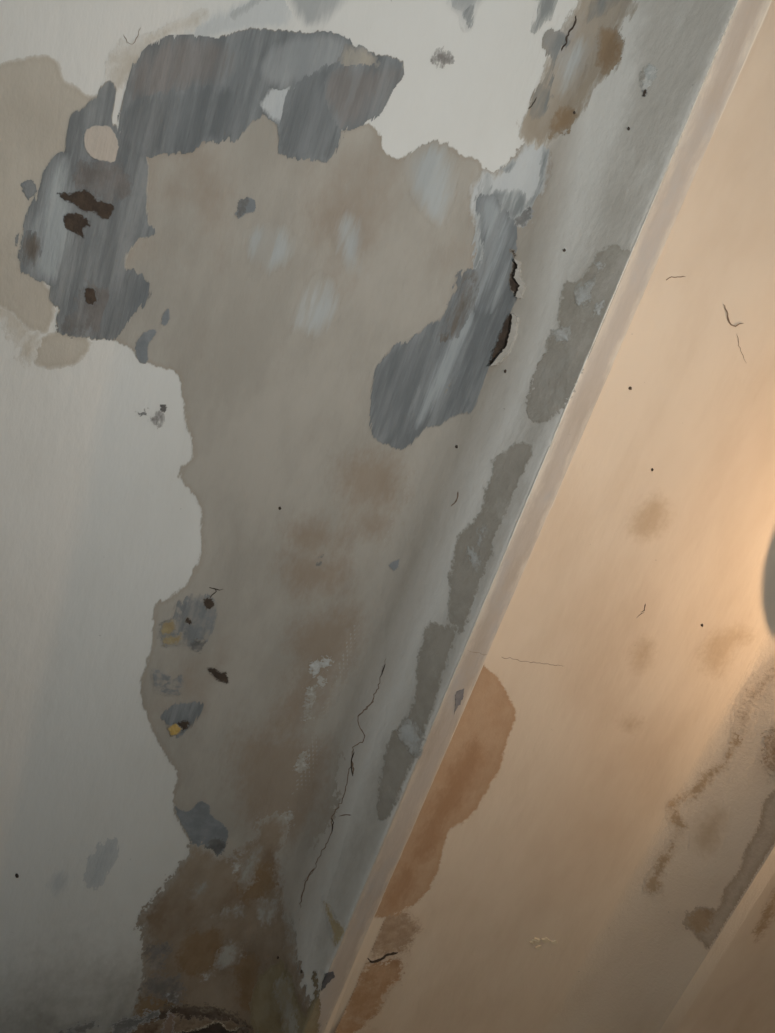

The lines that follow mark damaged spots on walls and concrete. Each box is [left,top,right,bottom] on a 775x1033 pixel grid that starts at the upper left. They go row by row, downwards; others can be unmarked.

damp [0,54,98,370]
peeling [134,308,171,364]
peeling [157,587,223,654]
peeling [15,27,404,341]
crack [299,659,386,906]
damp [110,0,640,1033]
peeling [369,193,533,451]
spalling [454,689,464,715]
damp [375,0,736,822]
damp [642,658,775,950]
damp [693,617,761,682]
spalling [57,1008,255,1033]